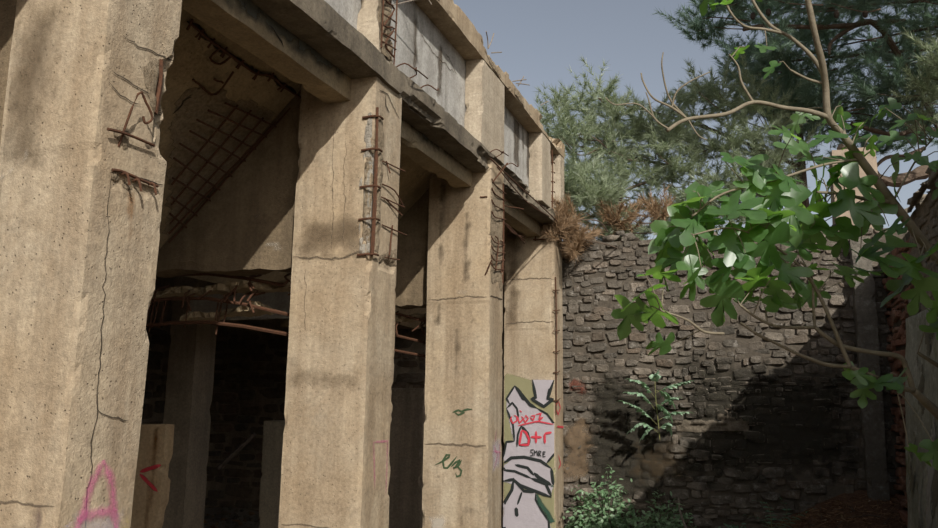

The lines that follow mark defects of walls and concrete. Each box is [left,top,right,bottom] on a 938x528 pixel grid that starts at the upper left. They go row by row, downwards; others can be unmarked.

crack [85,169,163,528]
spalling [107,19,301,235]
spalling [146,273,291,337]
crack [295,134,362,332]
spalling [357,107,407,264]
crack [0,499,54,507]